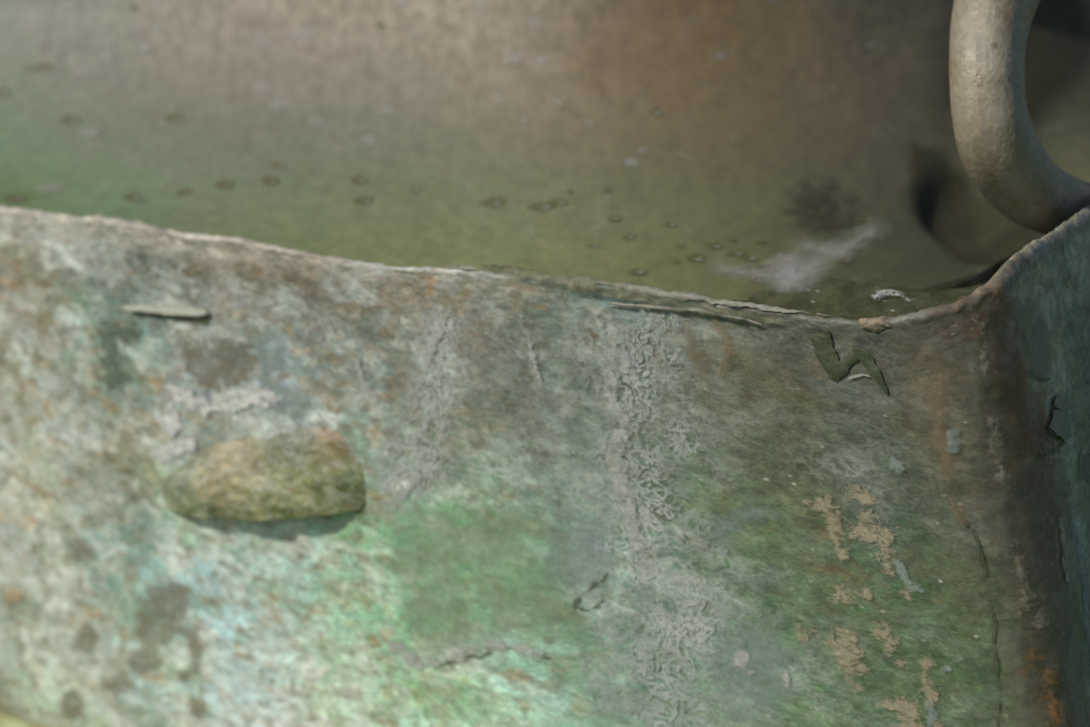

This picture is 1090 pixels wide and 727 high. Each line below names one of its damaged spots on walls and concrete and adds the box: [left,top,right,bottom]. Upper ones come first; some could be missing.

peeling [802,479,923,604]
peeling [797,623,870,693]
peeling [872,620,964,727]